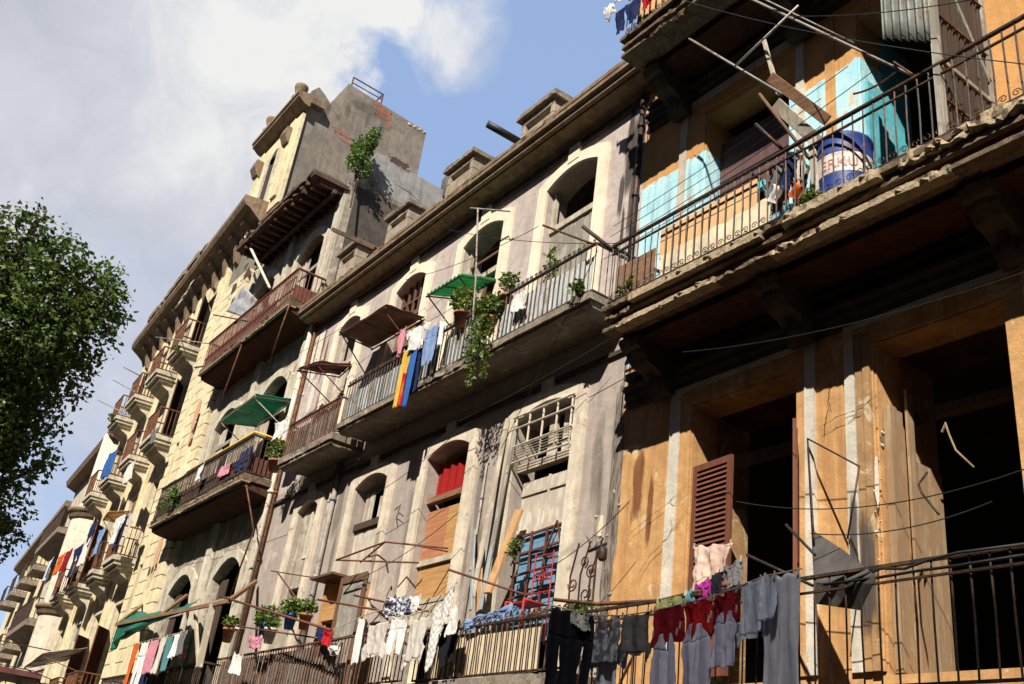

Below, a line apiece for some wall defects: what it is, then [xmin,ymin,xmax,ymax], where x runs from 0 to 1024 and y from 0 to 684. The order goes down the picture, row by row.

flaking render [374,100,392,130]
crack [813,387,880,437]
water stain [631,453,653,541]